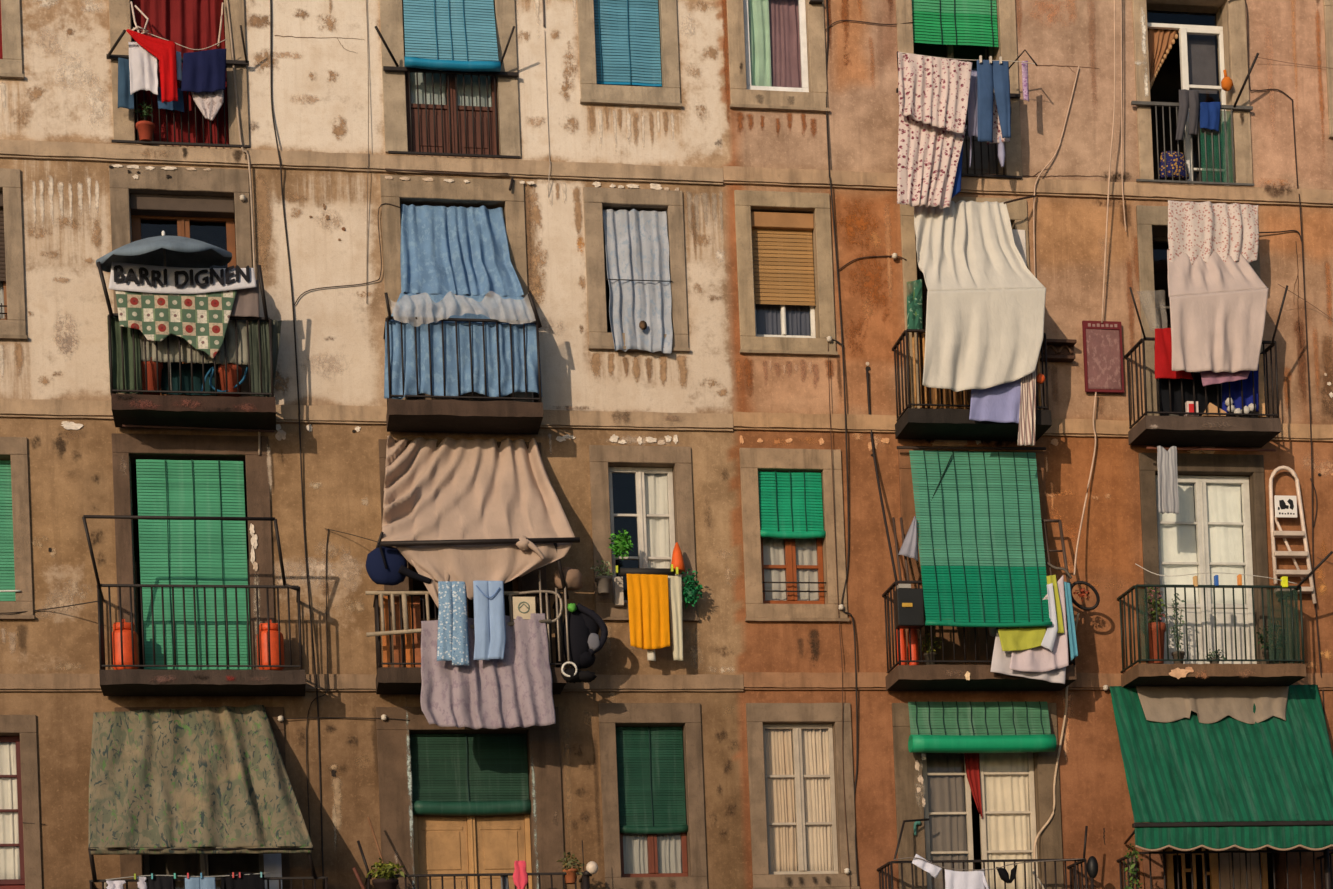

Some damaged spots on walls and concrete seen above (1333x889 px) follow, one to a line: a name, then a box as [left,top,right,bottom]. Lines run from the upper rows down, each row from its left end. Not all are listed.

peeling [249,15,270,27]
peeling [296,0,335,30]
peeling [255,52,299,69]
peeling [562,52,576,98]
peeling [332,118,346,139]
leakage [589,106,674,146]
leakage [591,353,687,386]